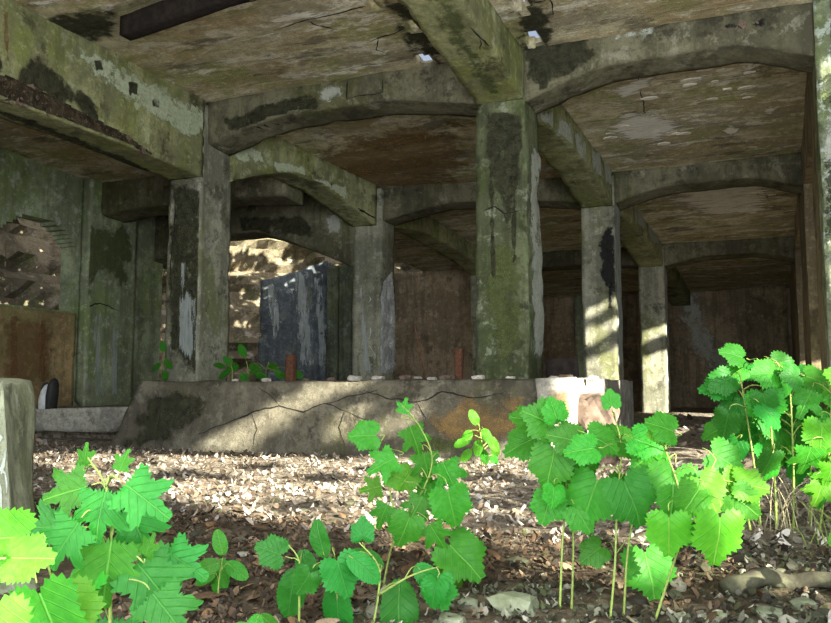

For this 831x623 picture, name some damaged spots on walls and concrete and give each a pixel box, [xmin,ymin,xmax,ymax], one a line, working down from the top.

water stain [517,0,594,89]
water stain [19,56,98,121]
water stain [224,86,341,131]
water stain [486,112,522,277]
water stain [530,148,544,356]
water stain [123,391,205,447]
crack [197,387,501,446]